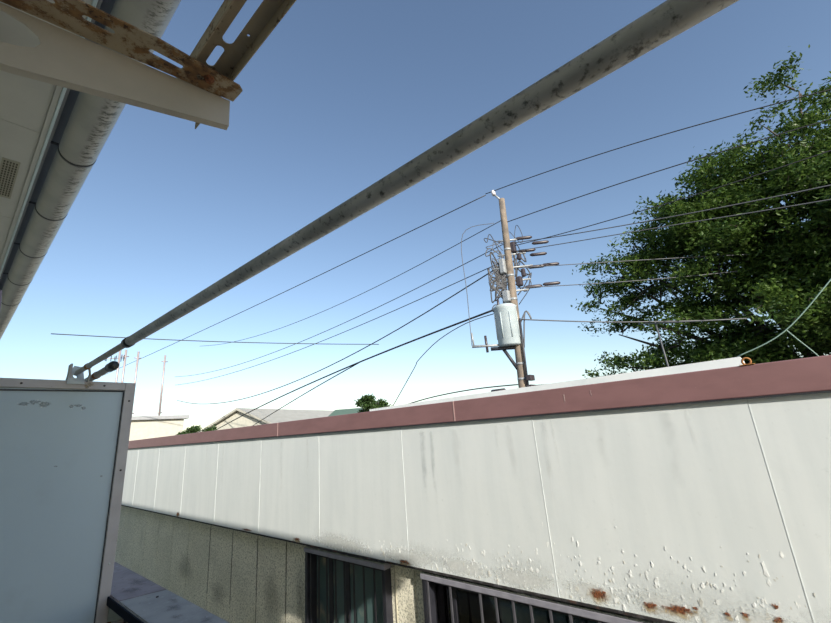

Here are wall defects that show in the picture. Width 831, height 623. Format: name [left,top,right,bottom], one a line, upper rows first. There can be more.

corrosion [592,589,606,602]
corrosion [644,602,698,618]